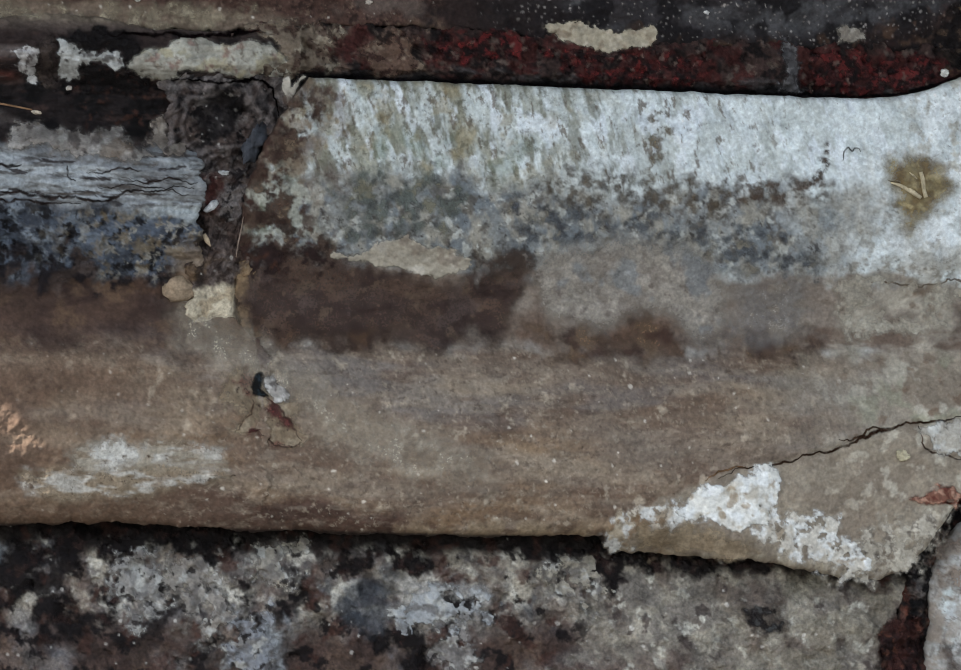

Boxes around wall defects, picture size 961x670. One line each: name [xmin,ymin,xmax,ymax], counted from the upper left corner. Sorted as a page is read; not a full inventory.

damp [283,92,326,121]
damp [238,111,835,355]
crack [705,416,961,481]
spalling [604,463,940,589]
peeling [535,555,616,619]
rust [869,616,924,670]